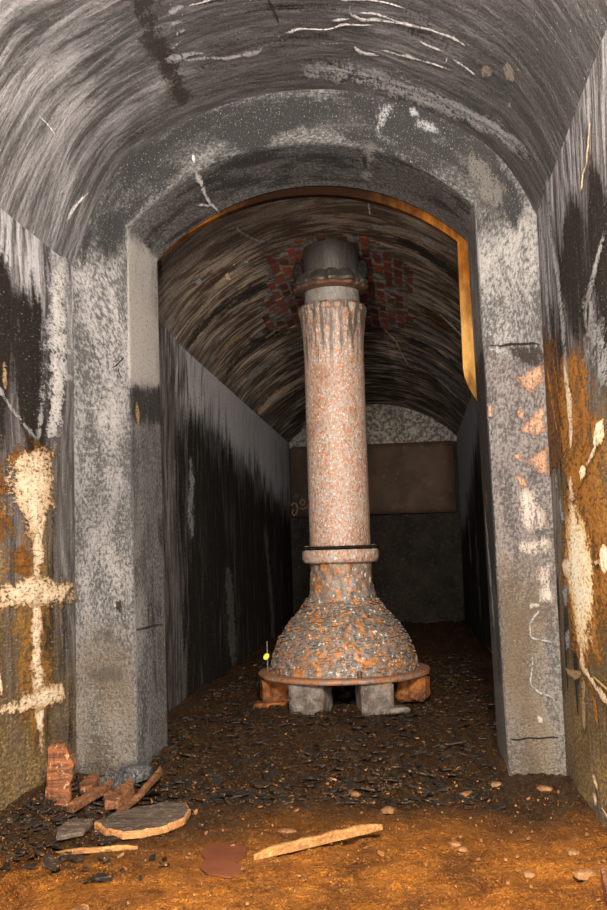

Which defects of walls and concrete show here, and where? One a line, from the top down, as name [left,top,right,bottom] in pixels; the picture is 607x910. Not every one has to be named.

leakage [132,0,265,105]
crack [268,0,373,34]
crack [192,155,266,243]
spalling [259,234,413,335]
leakage [581,231,607,396]
corrosion [0,435,52,745]
leakage [0,249,77,757]
corrosion [542,323,607,670]
efflorescence [554,419,607,731]